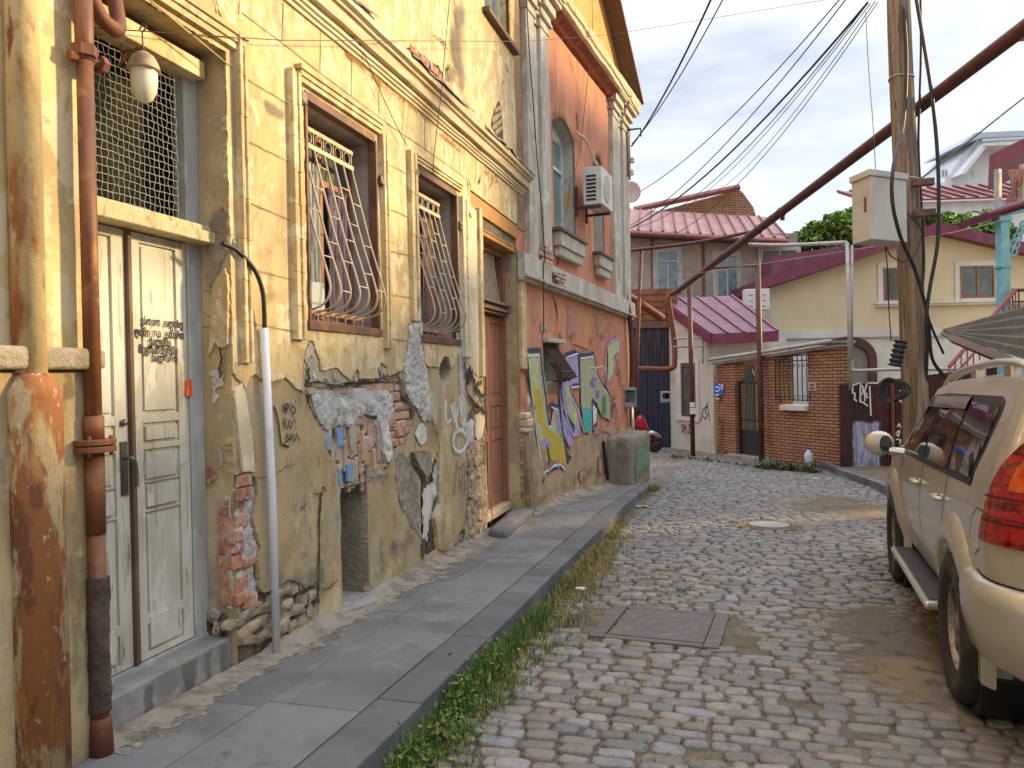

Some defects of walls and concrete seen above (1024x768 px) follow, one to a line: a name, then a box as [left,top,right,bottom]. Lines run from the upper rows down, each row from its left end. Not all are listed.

flaking render [206,207,238,356]
flaking render [205,369,318,646]
crack [260,456,337,617]
flaking render [303,343,438,541]